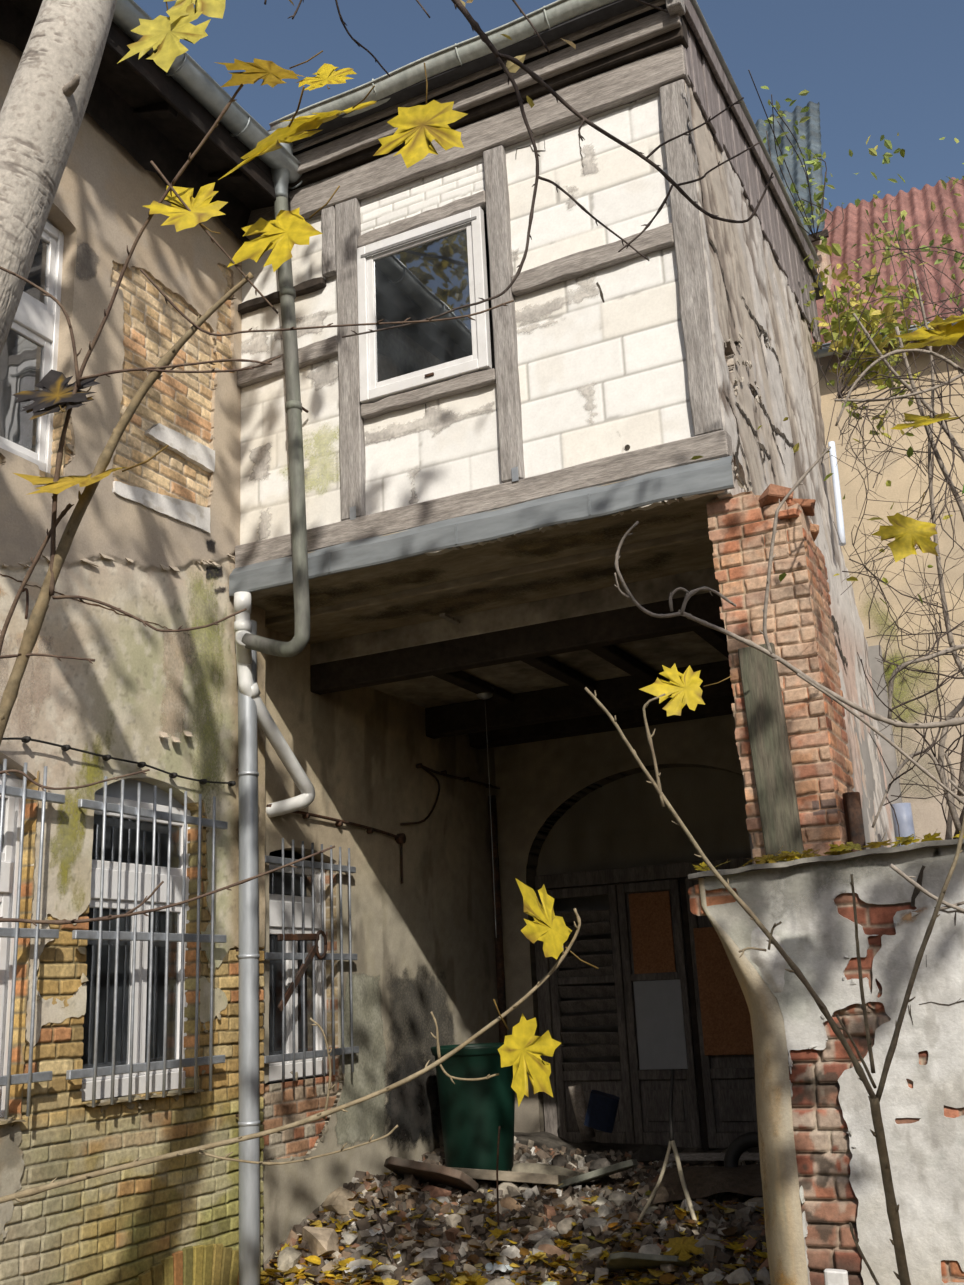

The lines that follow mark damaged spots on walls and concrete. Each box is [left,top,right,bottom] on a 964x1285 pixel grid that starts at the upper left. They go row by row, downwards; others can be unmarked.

flaking render [39,422,74,478]
flaking render [110,263,235,507]
crack [684,85,796,491]
water stain [189,577,224,813]
water stain [51,741,103,894]
flaking render [178,801,211,932]
flaking render [0,905,239,1285]
flaking render [259,946,340,1280]
water stain [335,968,454,1147]
flaking render [787,889,919,1285]
flaking render [941,1260,964,1283]